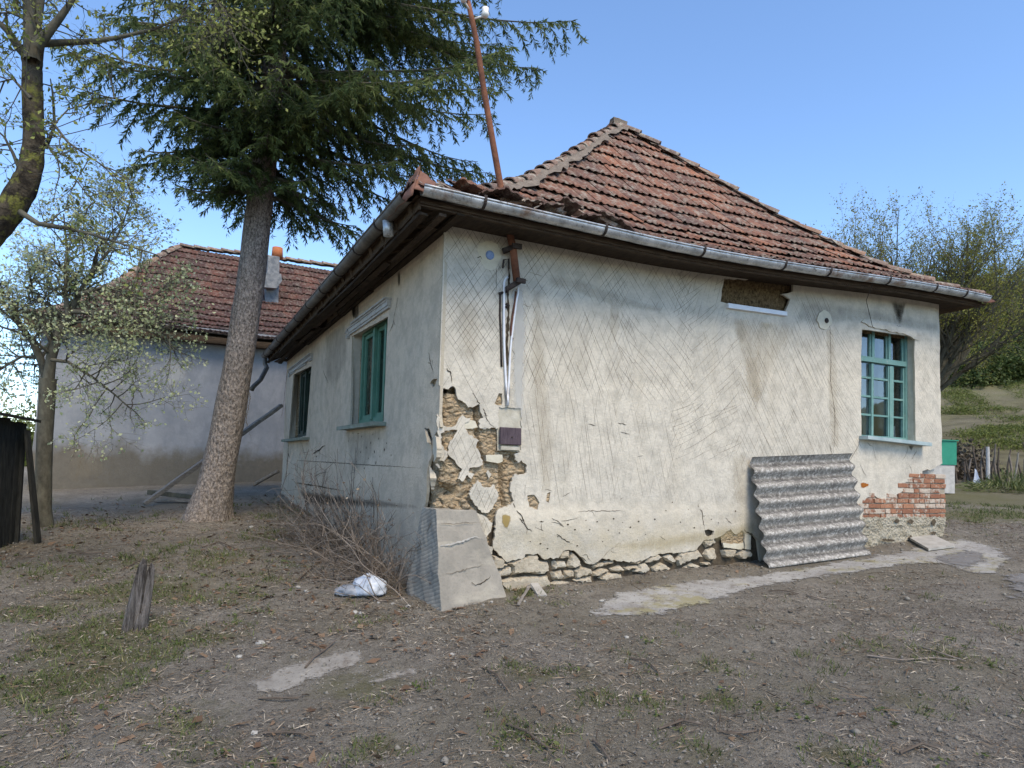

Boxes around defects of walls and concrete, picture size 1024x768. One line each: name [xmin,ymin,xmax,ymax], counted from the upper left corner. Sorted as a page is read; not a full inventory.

flaking render [424,369,526,554]
flaking render [858,473,946,541]